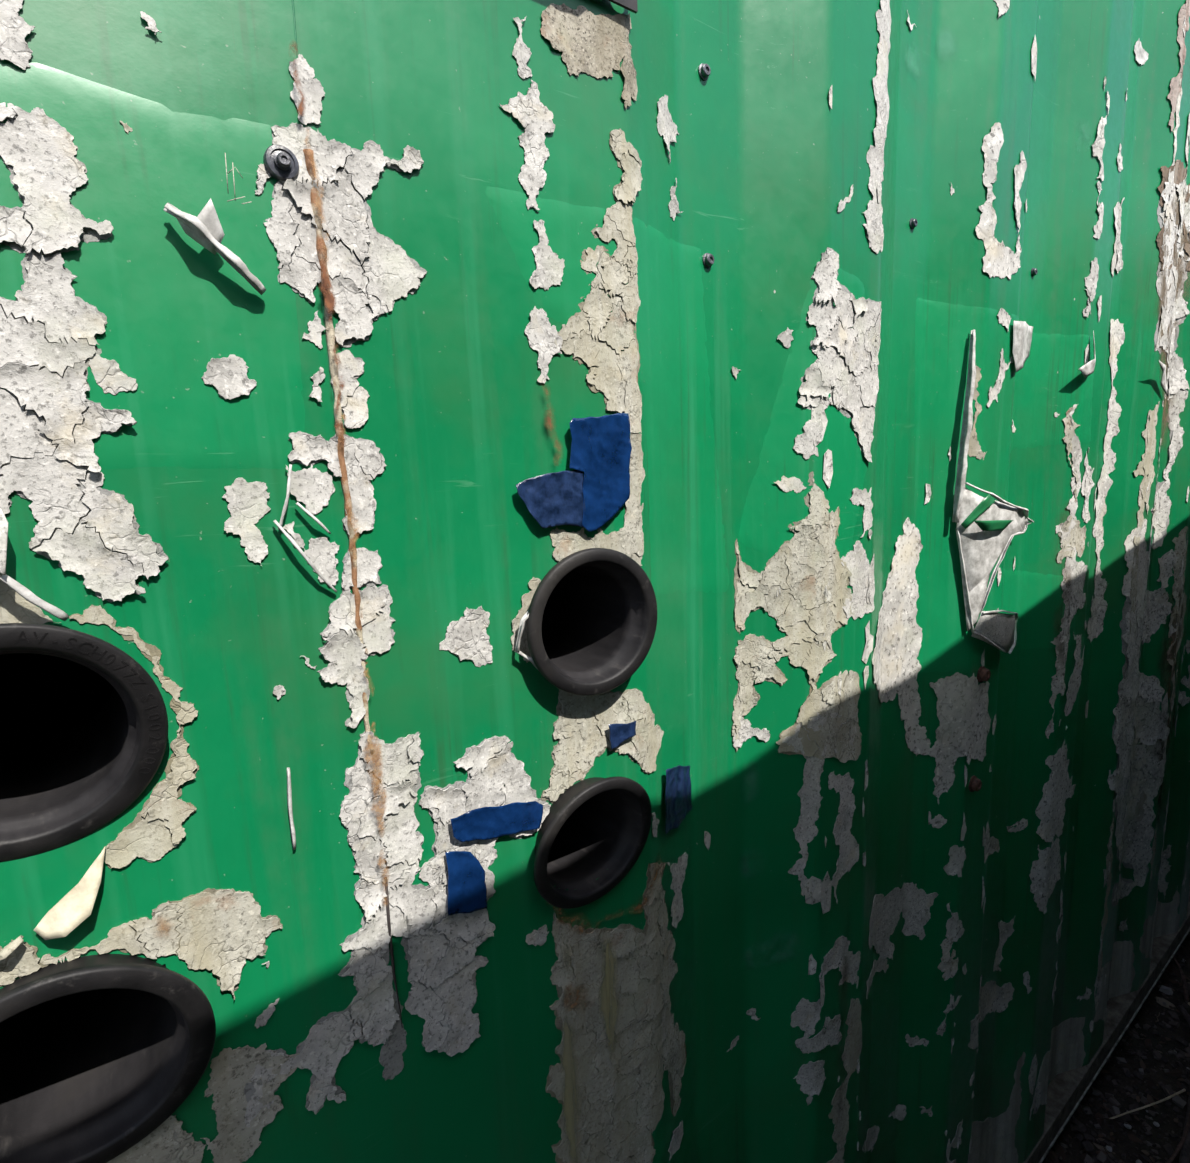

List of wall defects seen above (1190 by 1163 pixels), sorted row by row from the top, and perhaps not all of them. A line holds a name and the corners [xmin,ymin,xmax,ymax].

peeling [0,0,35,70]
rust [292,44,305,115]
peeling [1134,39,1149,65]
rust [318,238,335,321]
rust [1156,160,1190,441]
rust [335,382,345,443]
peeling [0,102,199,869]
peeling [732,247,991,903]
rust [363,723,386,833]
peeling [0,888,283,1000]